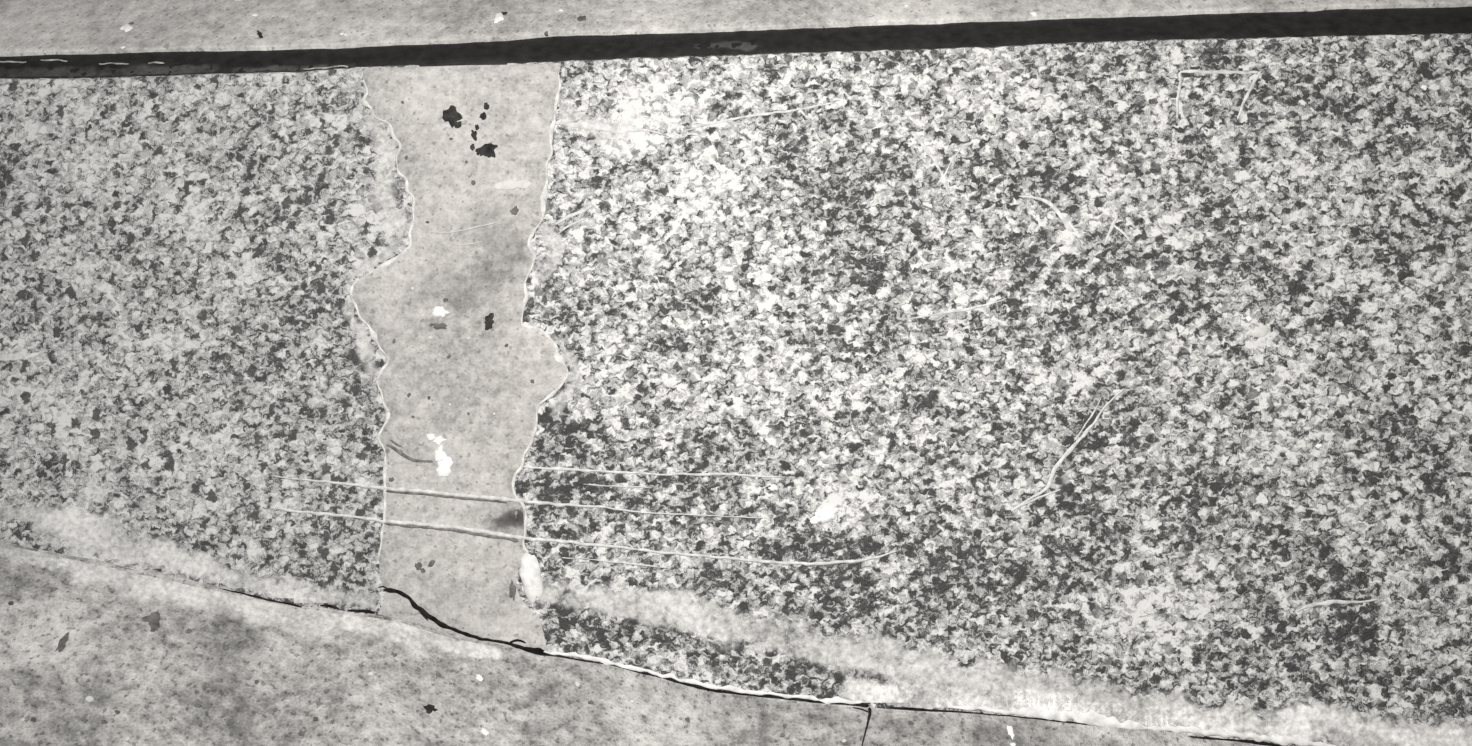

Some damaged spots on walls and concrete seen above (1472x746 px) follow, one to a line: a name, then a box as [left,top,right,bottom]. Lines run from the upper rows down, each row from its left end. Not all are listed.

spalling [442,102,498,185]
peeling [495,180,531,215]
peeling [420,298,450,350]
spalling [467,313,494,340]
spalling [509,553,543,604]
crack [207,585,1095,746]
crack [1189,736,1282,746]